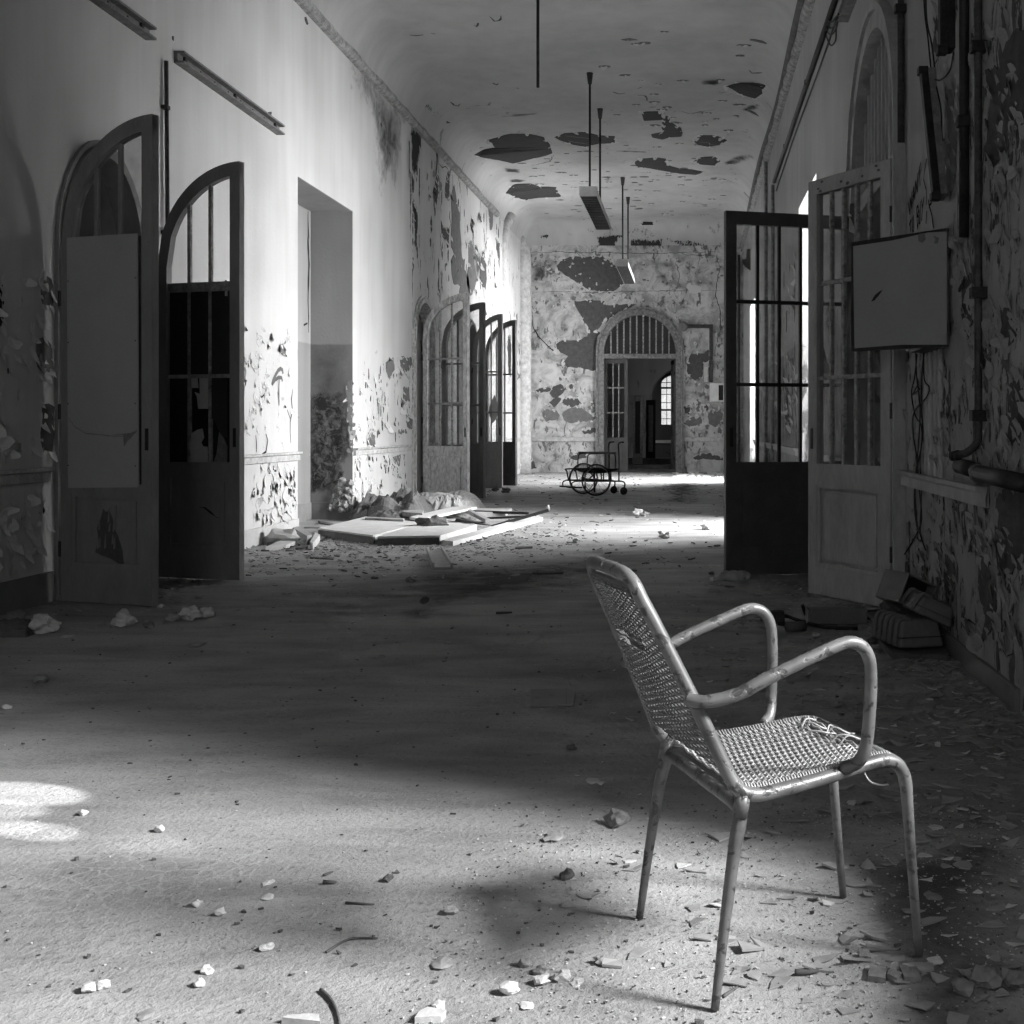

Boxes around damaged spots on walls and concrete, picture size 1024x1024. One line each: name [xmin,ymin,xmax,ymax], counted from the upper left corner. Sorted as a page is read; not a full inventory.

water stain [376,104,421,296]
peeling [411,162,502,328]
flaking render [475,131,629,201]
flaking render [599,65,733,226]
flaking render [717,79,768,117]
peeling [902,0,1024,473]
peeling [244,325,291,436]
peeling [253,462,298,526]
peeling [343,353,414,500]
flaking render [532,254,646,435]
flaking render [684,319,724,434]
peeling [905,484,1024,660]